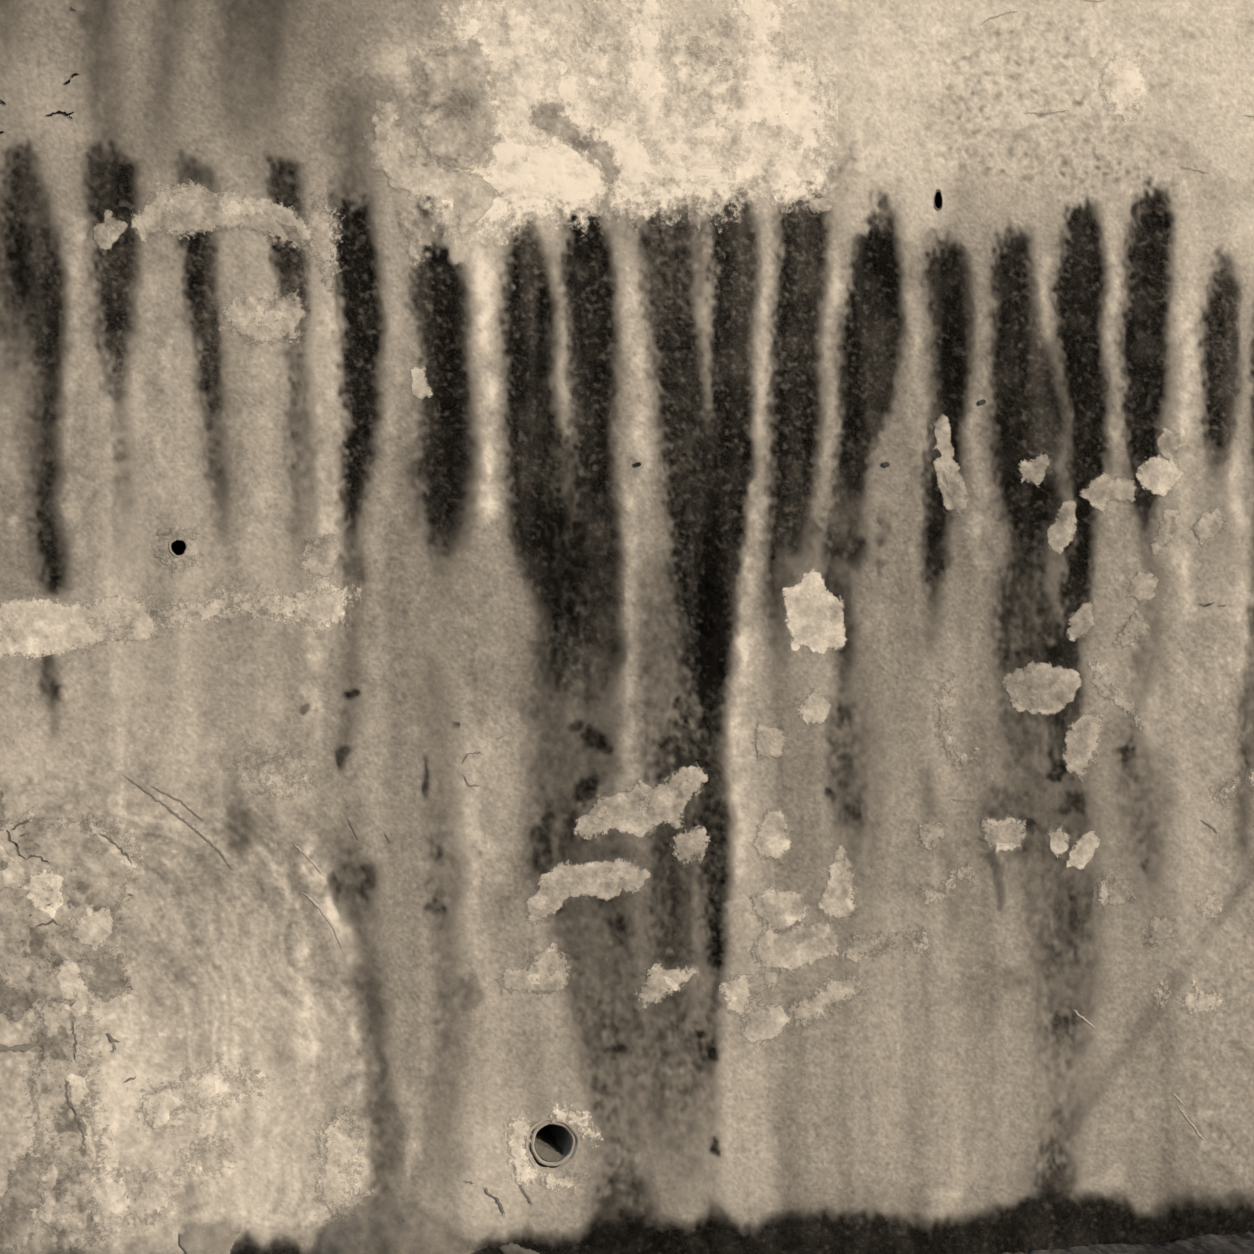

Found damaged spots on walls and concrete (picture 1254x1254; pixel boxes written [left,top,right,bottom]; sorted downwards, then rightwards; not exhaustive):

peeling [219,189,310,248]
peeling [252,301,289,330]
water stain [331,185,384,576]
water stain [411,231,471,547]
water stain [501,207,622,678]
water stain [641,181,828,733]
water stain [828,196,905,563]
water stain [922,241,973,602]
water stain [991,182,1174,731]
peeling [1012,702,1056,715]
peeling [664,967,693,991]
water stain [472,1183,1254,1254]